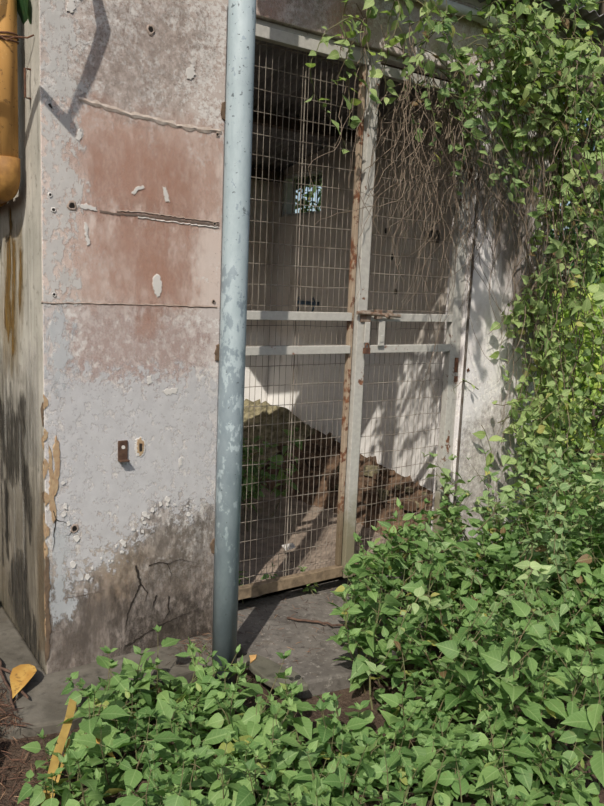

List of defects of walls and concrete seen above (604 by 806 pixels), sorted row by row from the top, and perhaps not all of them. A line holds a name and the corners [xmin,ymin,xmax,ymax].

corrosion [4,206,22,355]
peeling [40,0,97,308]
peeling [152,274,162,298]
water stain [477,157,534,309]
water stain [0,393,41,663]
peeling [39,344,220,663]
water stain [50,513,212,671]
crack [125,559,199,647]